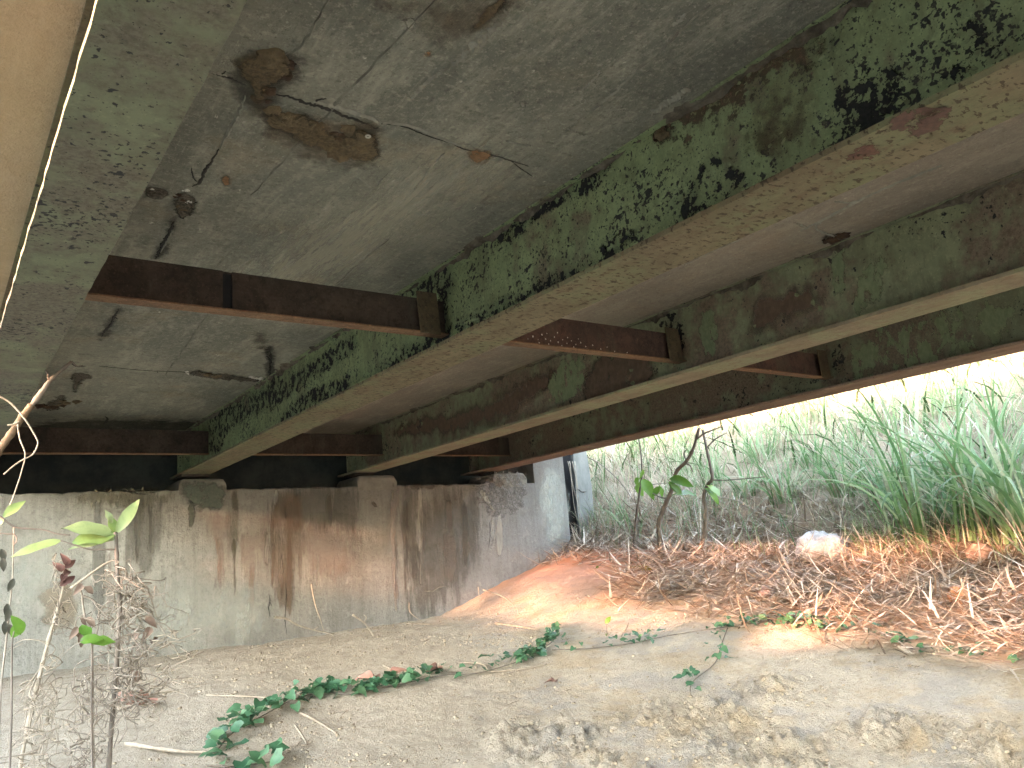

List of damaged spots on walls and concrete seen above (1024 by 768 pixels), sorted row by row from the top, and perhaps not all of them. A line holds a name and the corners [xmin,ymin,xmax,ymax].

crack [191,71,246,187]
crack [275,94,531,176]
peeling [831,63,952,163]
crack [153,221,175,259]
spalling [145,187,196,219]
spalling [476,471,529,517]
damp [230,492,238,588]